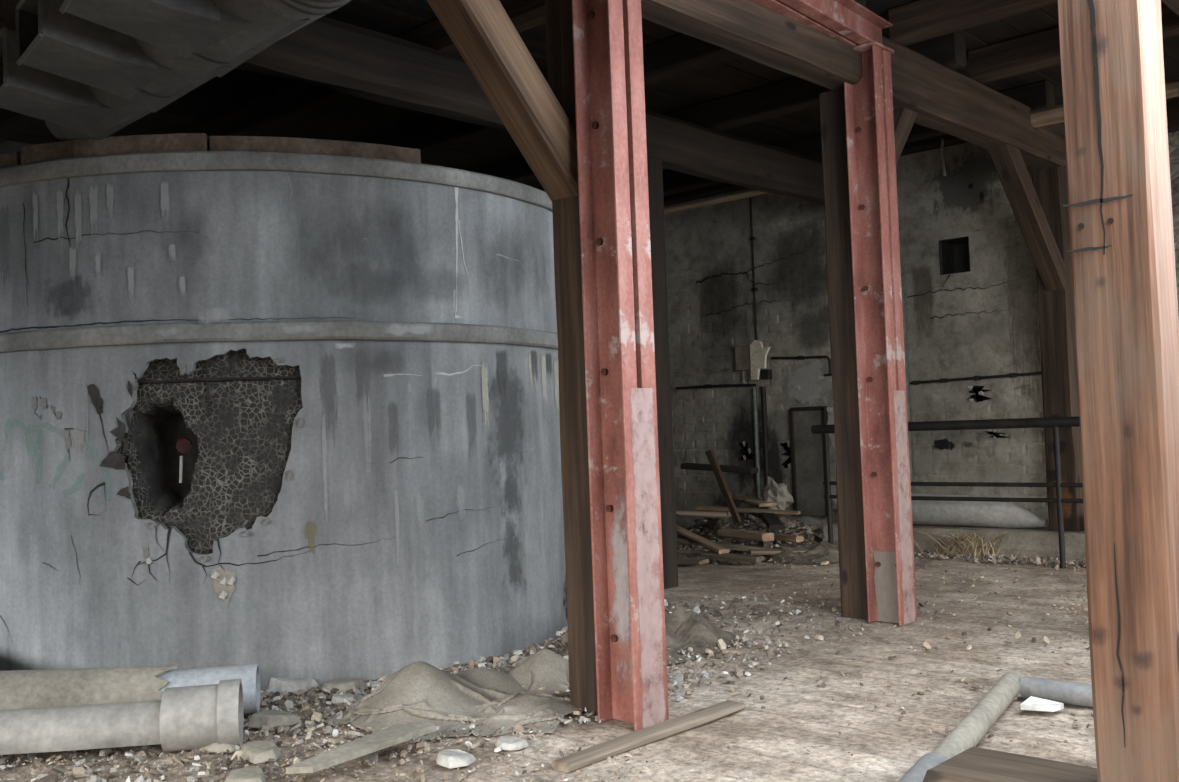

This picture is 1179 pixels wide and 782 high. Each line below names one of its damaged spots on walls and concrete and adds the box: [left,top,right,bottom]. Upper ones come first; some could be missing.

water stain [48,185,114,315]
crack [0,178,344,333]
water stain [453,187,471,318]
water stain [387,324,432,336]
water stain [321,344,422,426]
water stain [427,390,441,429]
water stain [436,350,560,456]
spalling [87,349,304,605]
water stain [505,479,517,508]
crack [127,527,394,586]
water stain [506,523,522,582]
crack [1114,543,1125,748]